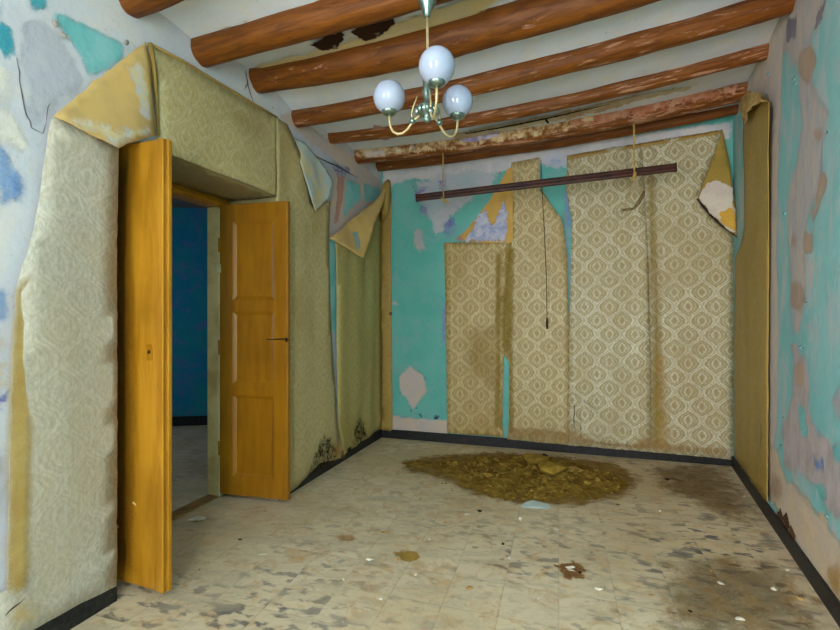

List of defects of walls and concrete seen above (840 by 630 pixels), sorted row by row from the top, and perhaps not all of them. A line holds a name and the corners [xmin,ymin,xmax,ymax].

peeling [255,0,498,69]
crack [16,58,50,134]
peeling [272,107,733,409]
peeling [747,0,840,601]
spalling [392,366,447,433]
damp [309,419,368,480]